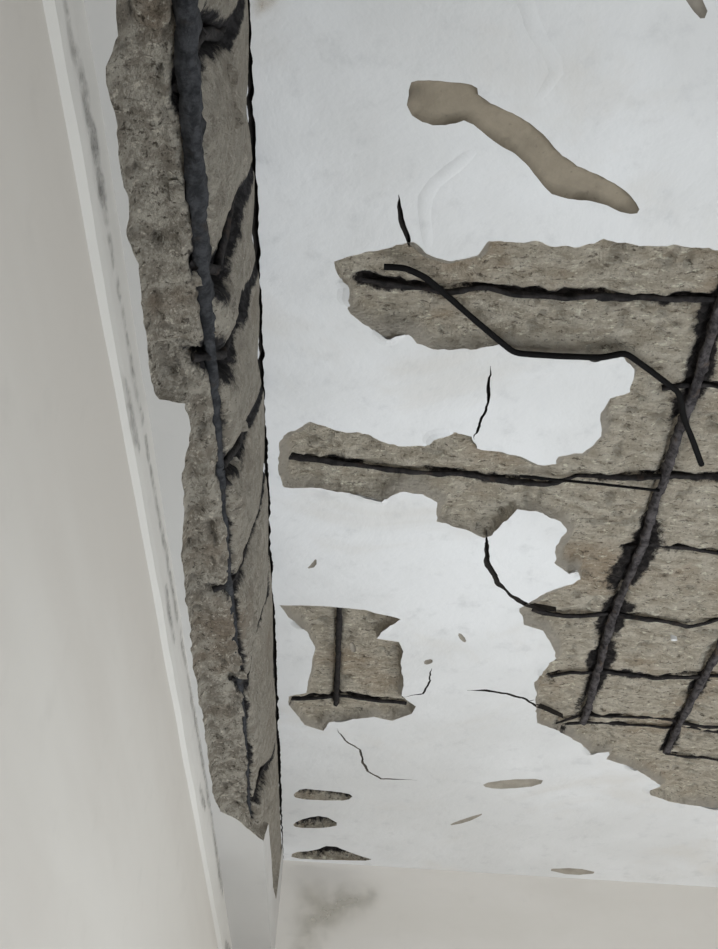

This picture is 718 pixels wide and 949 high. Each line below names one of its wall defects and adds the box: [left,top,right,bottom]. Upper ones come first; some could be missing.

peeling [407,80,639,214]
spalling [106,0,416,898]
crack [473,366,492,438]
spalling [278,239,718,811]
crack [337,729,417,781]